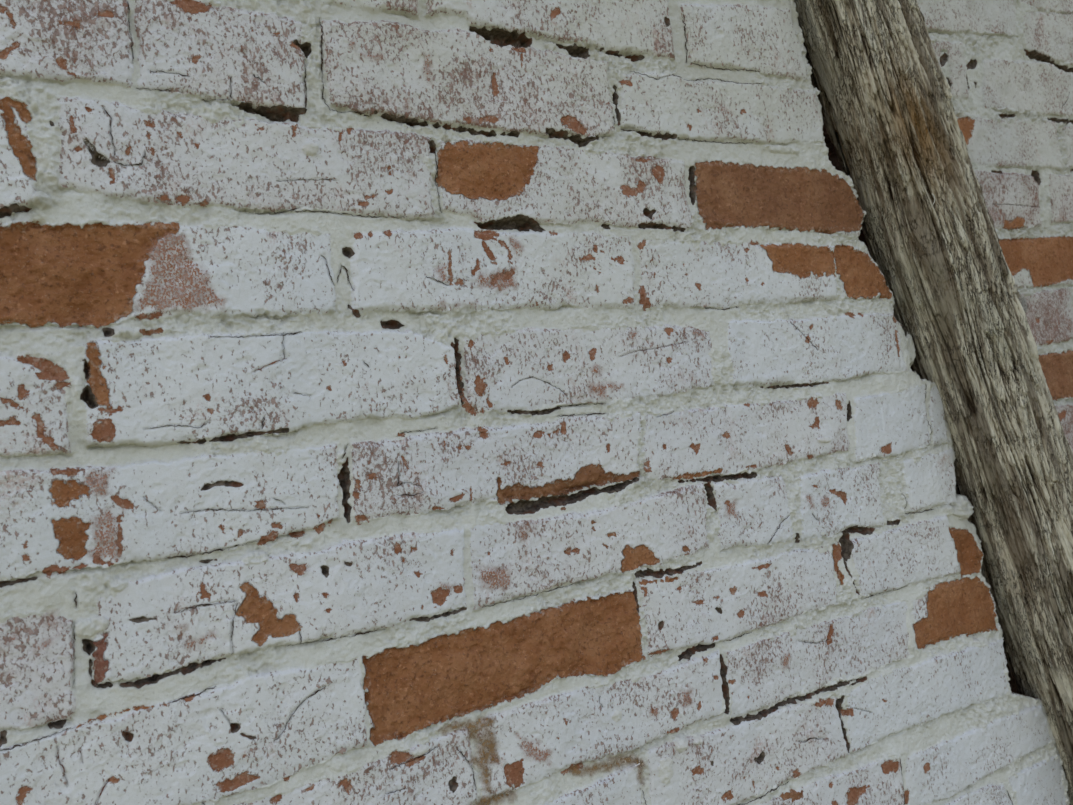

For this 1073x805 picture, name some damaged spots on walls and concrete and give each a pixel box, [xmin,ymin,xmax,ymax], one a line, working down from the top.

spalling [436,140,539,200]
spalling [0,221,225,336]
spalling [690,160,892,300]
spalling [999,216,1073,287]
peeling [17,354,72,390]
spalling [86,342,122,442]
spalling [1038,339,1073,421]
spalling [42,467,134,579]
spalling [497,459,652,510]
spalling [236,582,303,647]
spalling [362,520,682,768]
spalling [913,527,998,649]